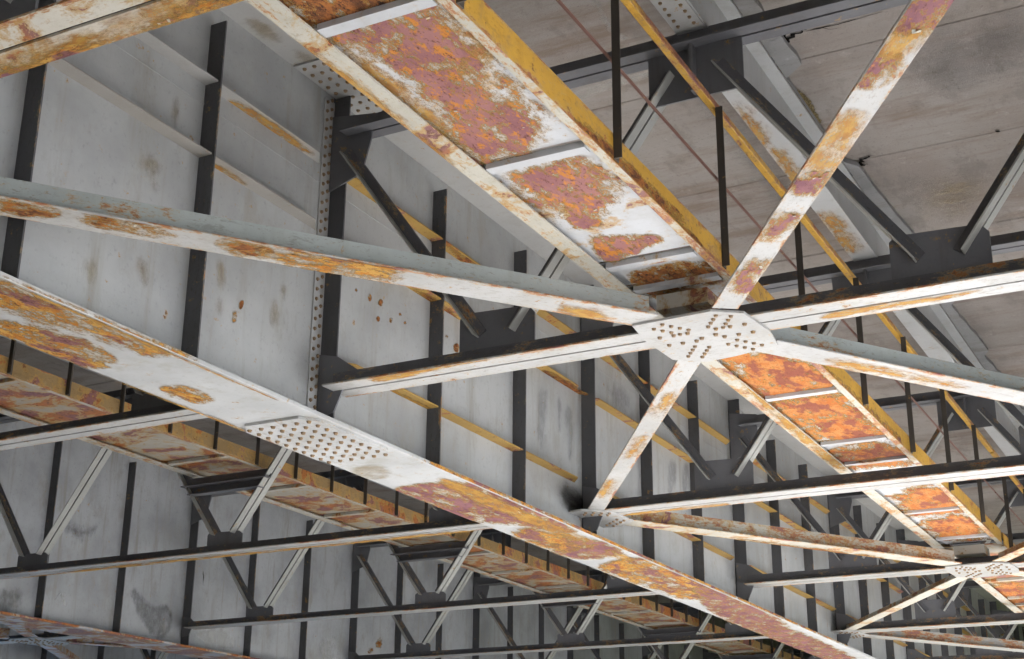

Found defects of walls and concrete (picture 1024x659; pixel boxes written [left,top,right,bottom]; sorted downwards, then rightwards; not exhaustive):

rust [0,0,244,74]
rust [858,0,954,90]
rust [310,51,453,165]
rust [741,110,862,197]
rust [0,199,61,218]
rust [80,214,174,238]
rust [759,213,801,241]
rust [217,239,406,324]
rust [0,277,276,400]
rust [717,352,963,471]
rust [892,485,993,543]
rust [24,460,856,659]